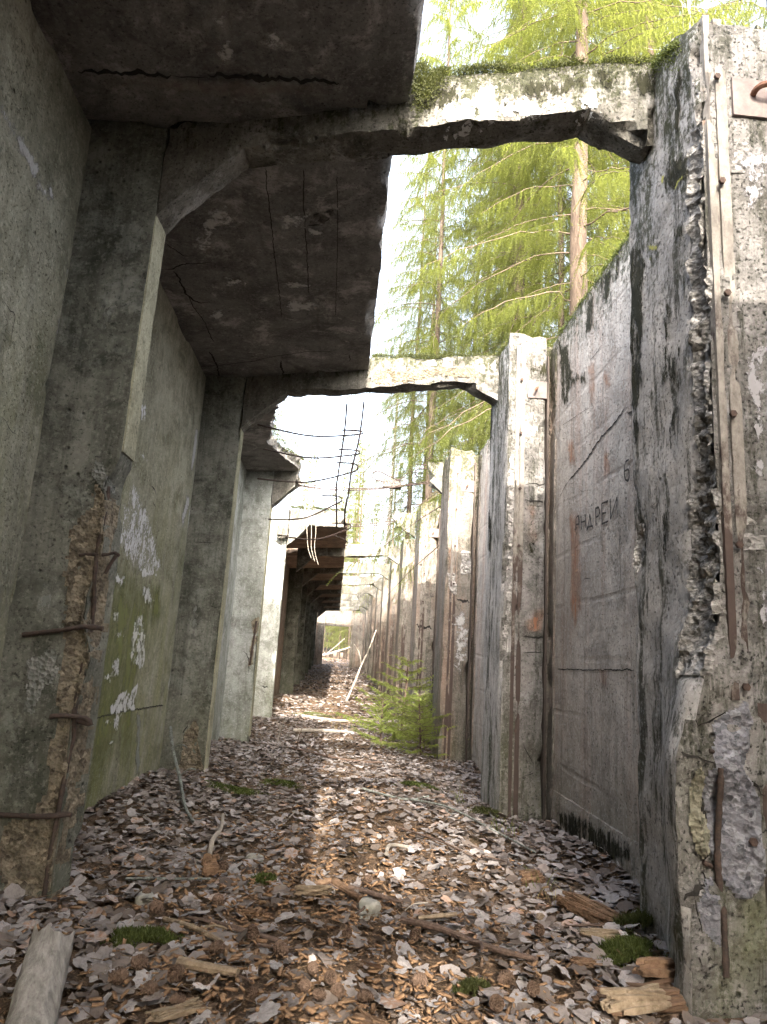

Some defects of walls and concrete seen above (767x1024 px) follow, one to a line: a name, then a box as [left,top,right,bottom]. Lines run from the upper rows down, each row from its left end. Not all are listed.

crack [78,68,339,85]
peeling [443,86,543,140]
peeling [575,89,598,126]
spalling [674,128,734,678]
spalling [743,517,767,550]
spalling [0,460,161,900]
spalling [684,701,766,978]